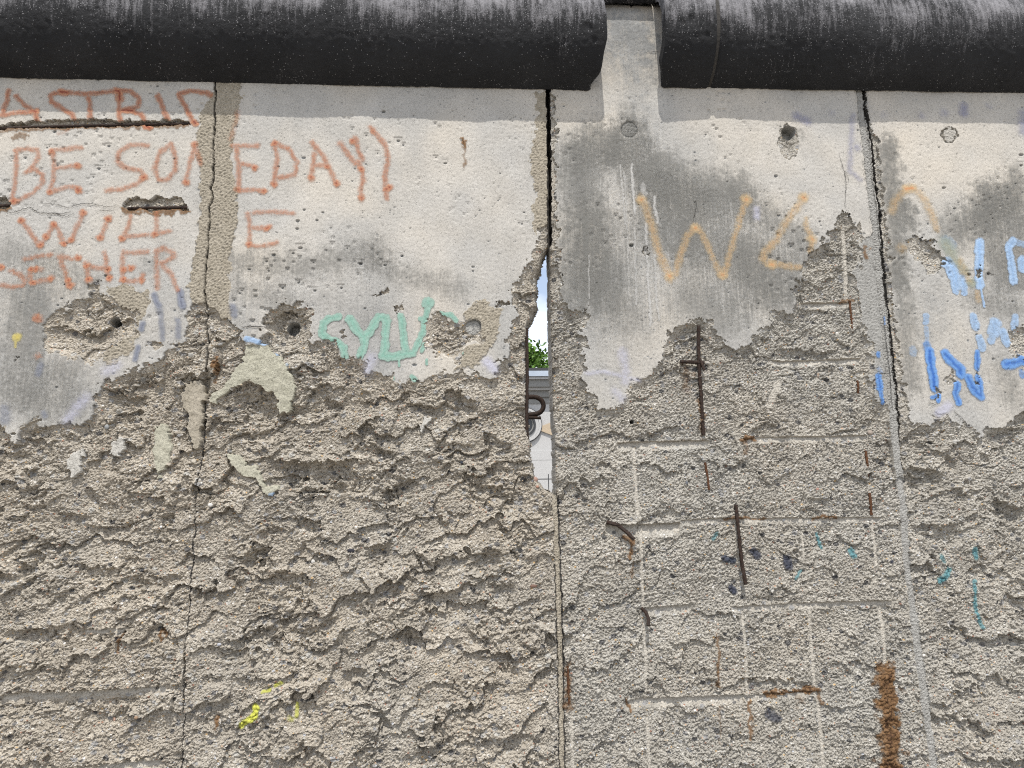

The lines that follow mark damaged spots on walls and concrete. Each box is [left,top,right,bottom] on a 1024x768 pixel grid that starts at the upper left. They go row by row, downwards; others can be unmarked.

crack [180,406,207,768]
spalling [0,224,559,768]
water stain [555,113,810,329]
spalling [550,92,931,768]
rust [872,661,909,768]
spalling [869,123,1024,768]